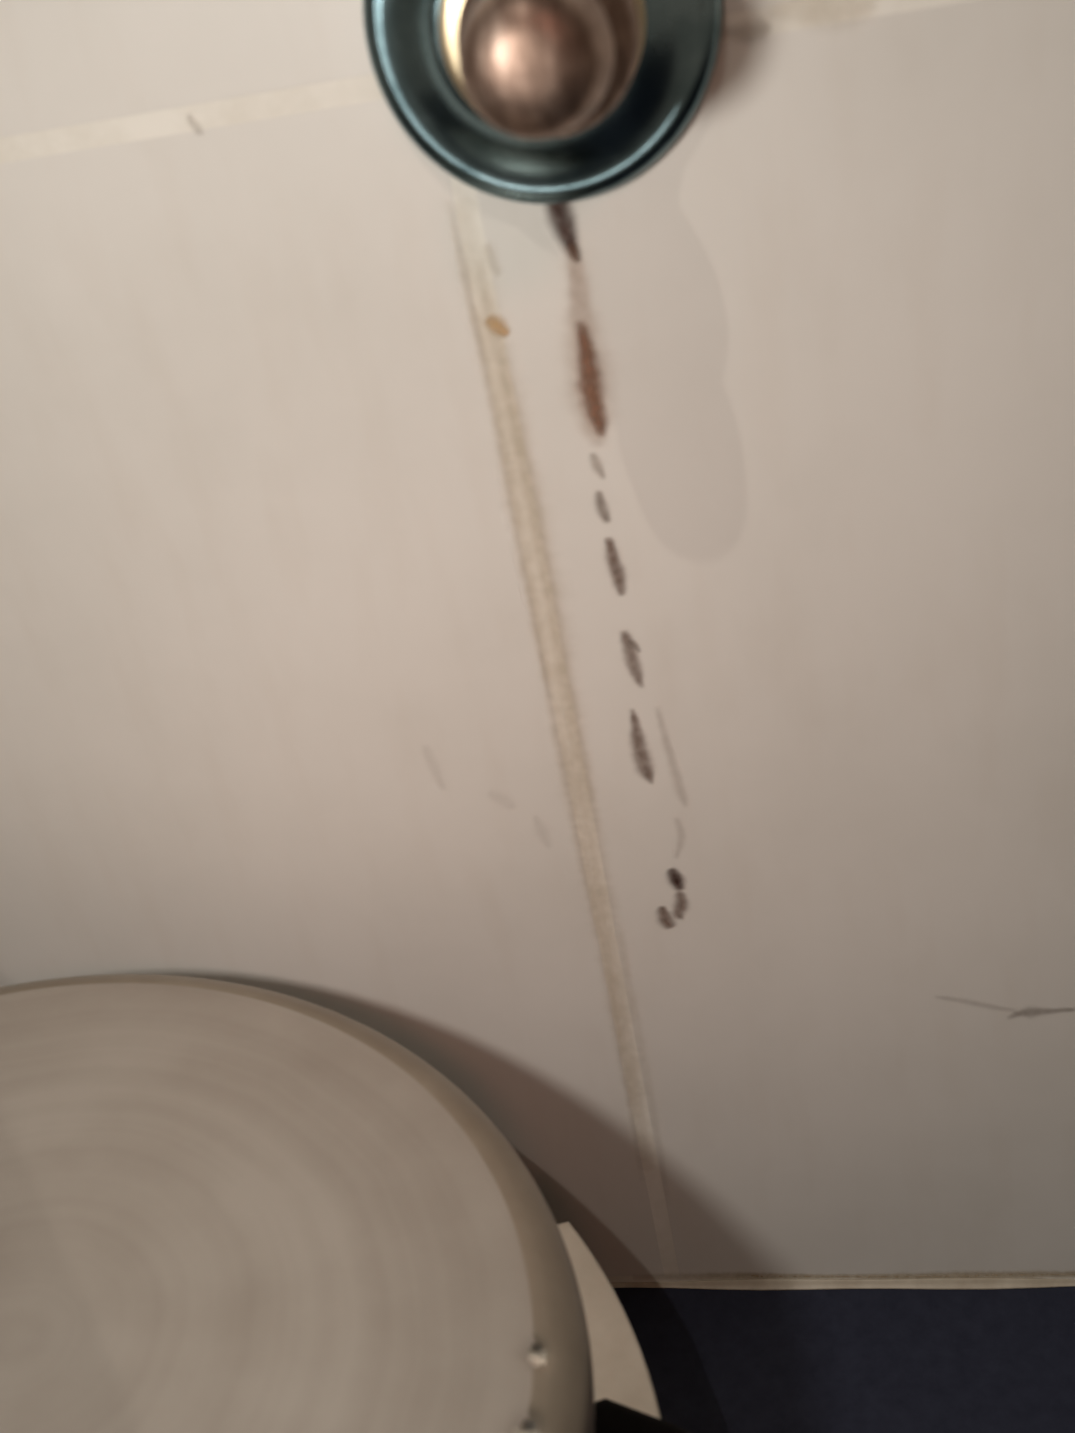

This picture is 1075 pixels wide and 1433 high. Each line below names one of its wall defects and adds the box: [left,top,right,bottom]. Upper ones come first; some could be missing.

rust [549,203,579,261]
rust [579,326,604,433]
rust [606,540,623,592]
rust [623,634,640,682]
rust [631,715,652,779]
rust [659,869,685,927]